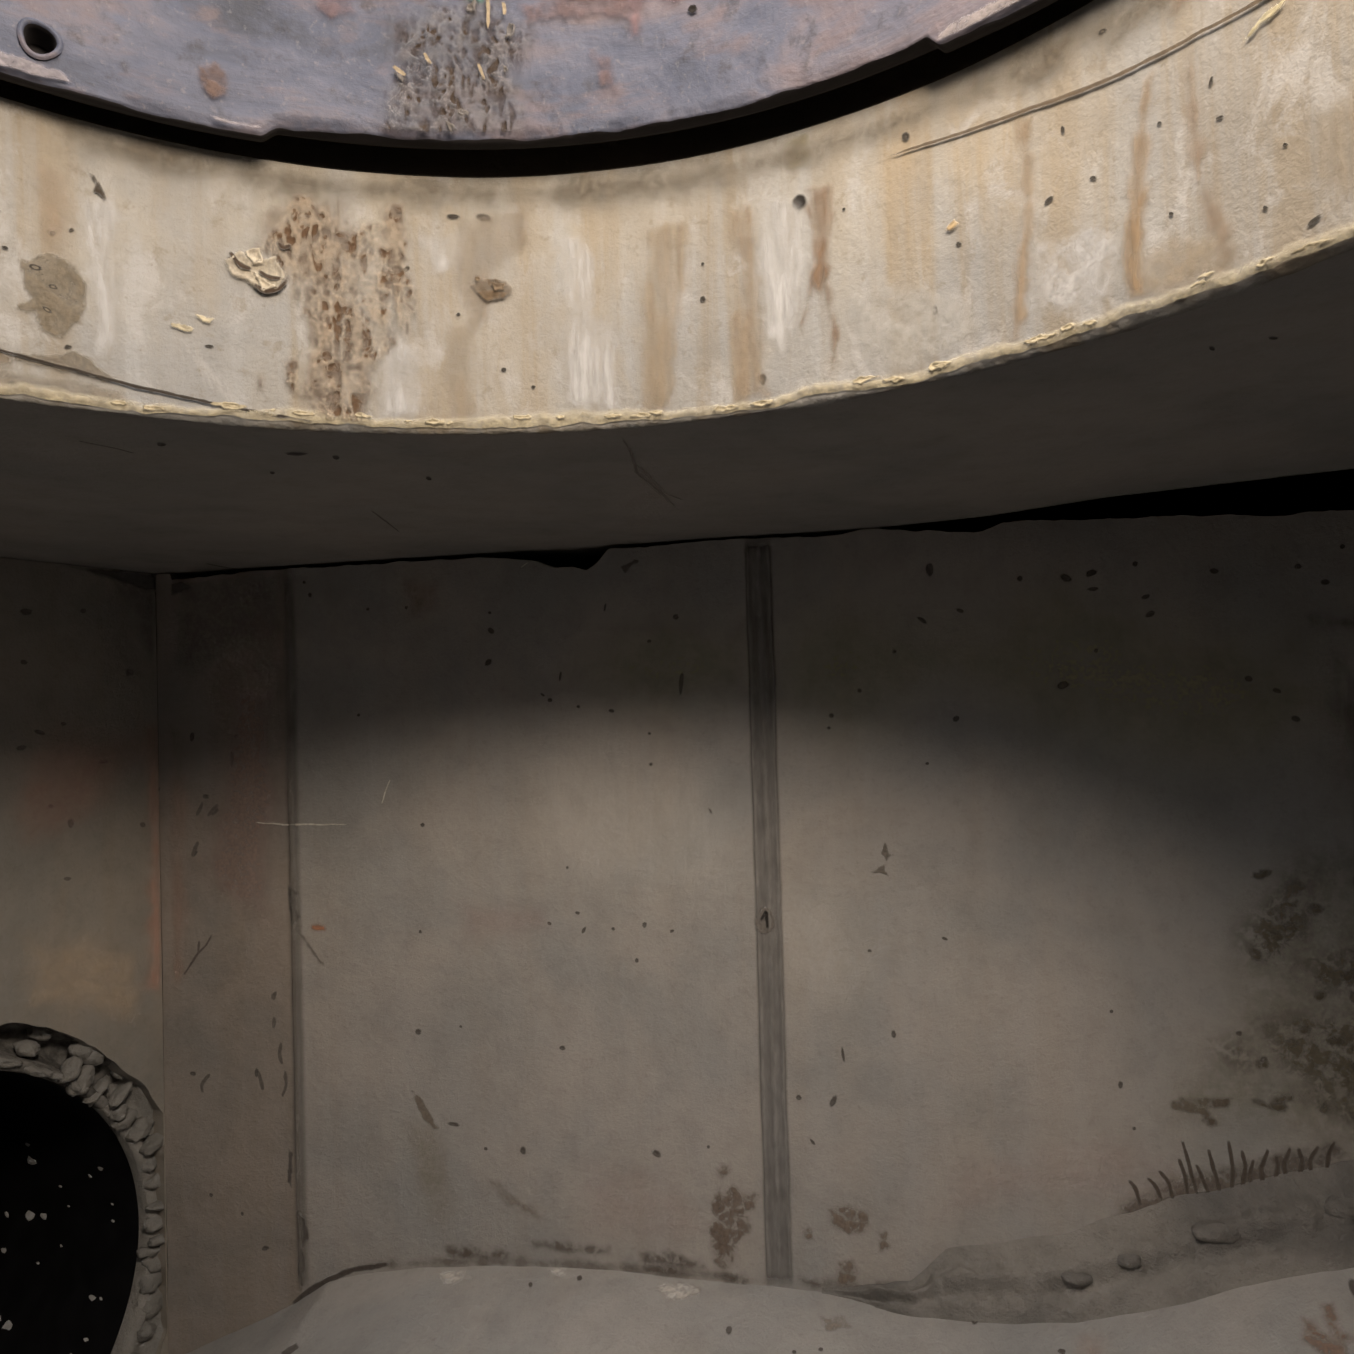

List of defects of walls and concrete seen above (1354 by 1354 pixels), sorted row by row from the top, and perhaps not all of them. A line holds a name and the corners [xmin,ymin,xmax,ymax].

crack [894,0,1263,155]
leakage [0,253,124,402]
spalling [0,196,1354,428]
corrosion [807,187,832,296]
corrosion [1125,133,1147,294]
leakage [1249,881,1323,961]
leakage [1226,1016,1354,1117]
peeling [710,1166,756,1268]